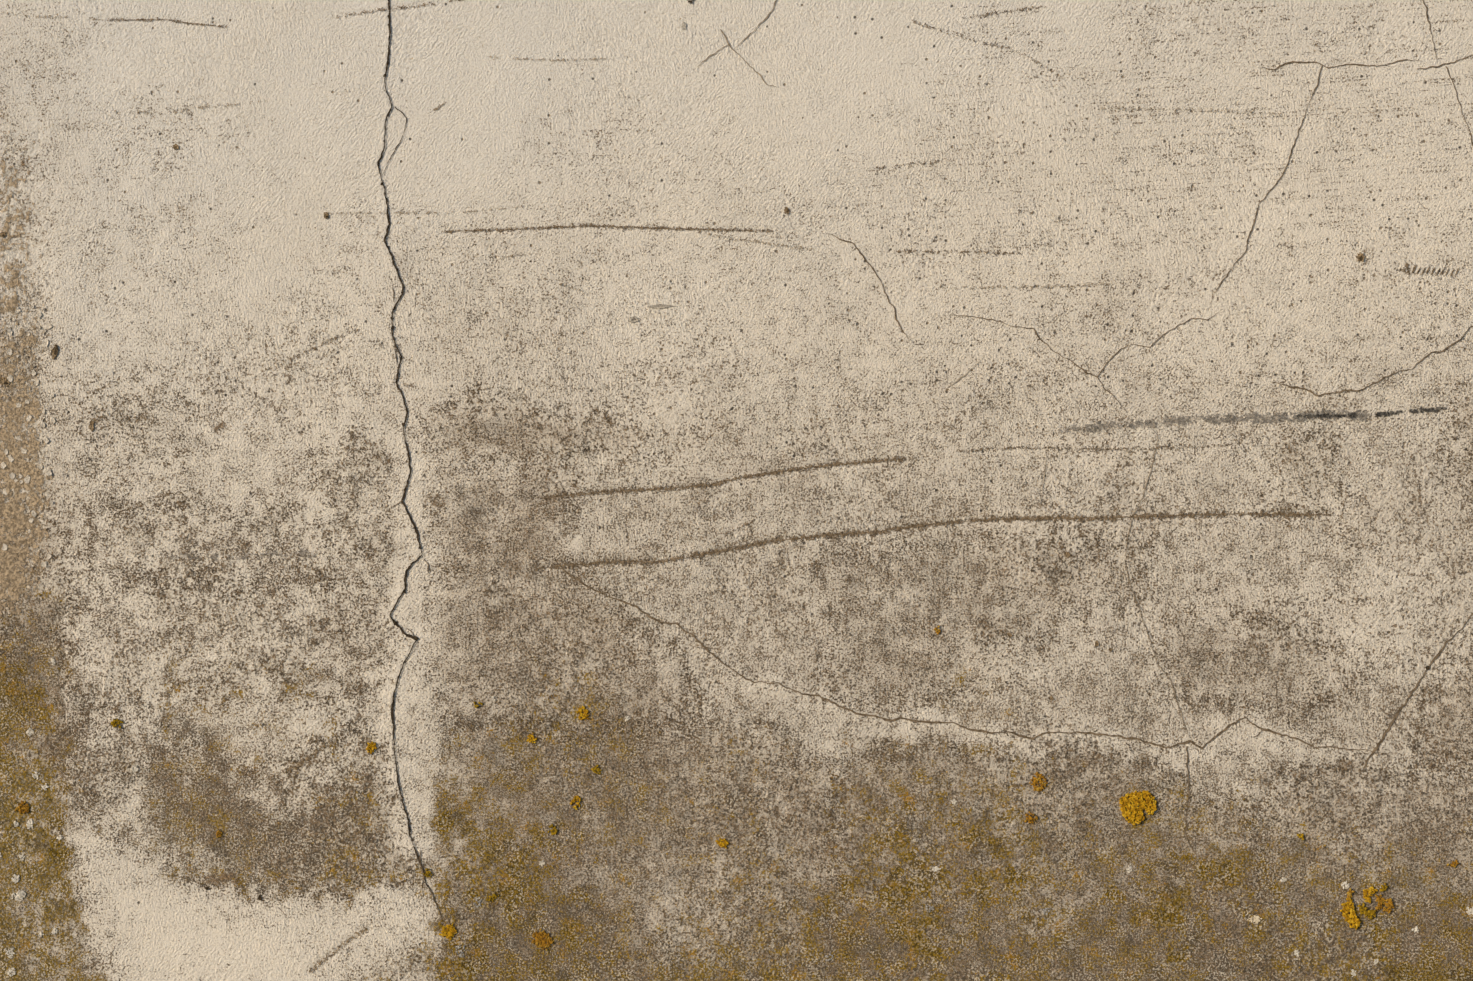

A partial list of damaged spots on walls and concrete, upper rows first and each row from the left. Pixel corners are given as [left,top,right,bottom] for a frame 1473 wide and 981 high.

crack [377,0,443,926]
water stain [0,366,1473,981]
crack [547,0,1473,863]